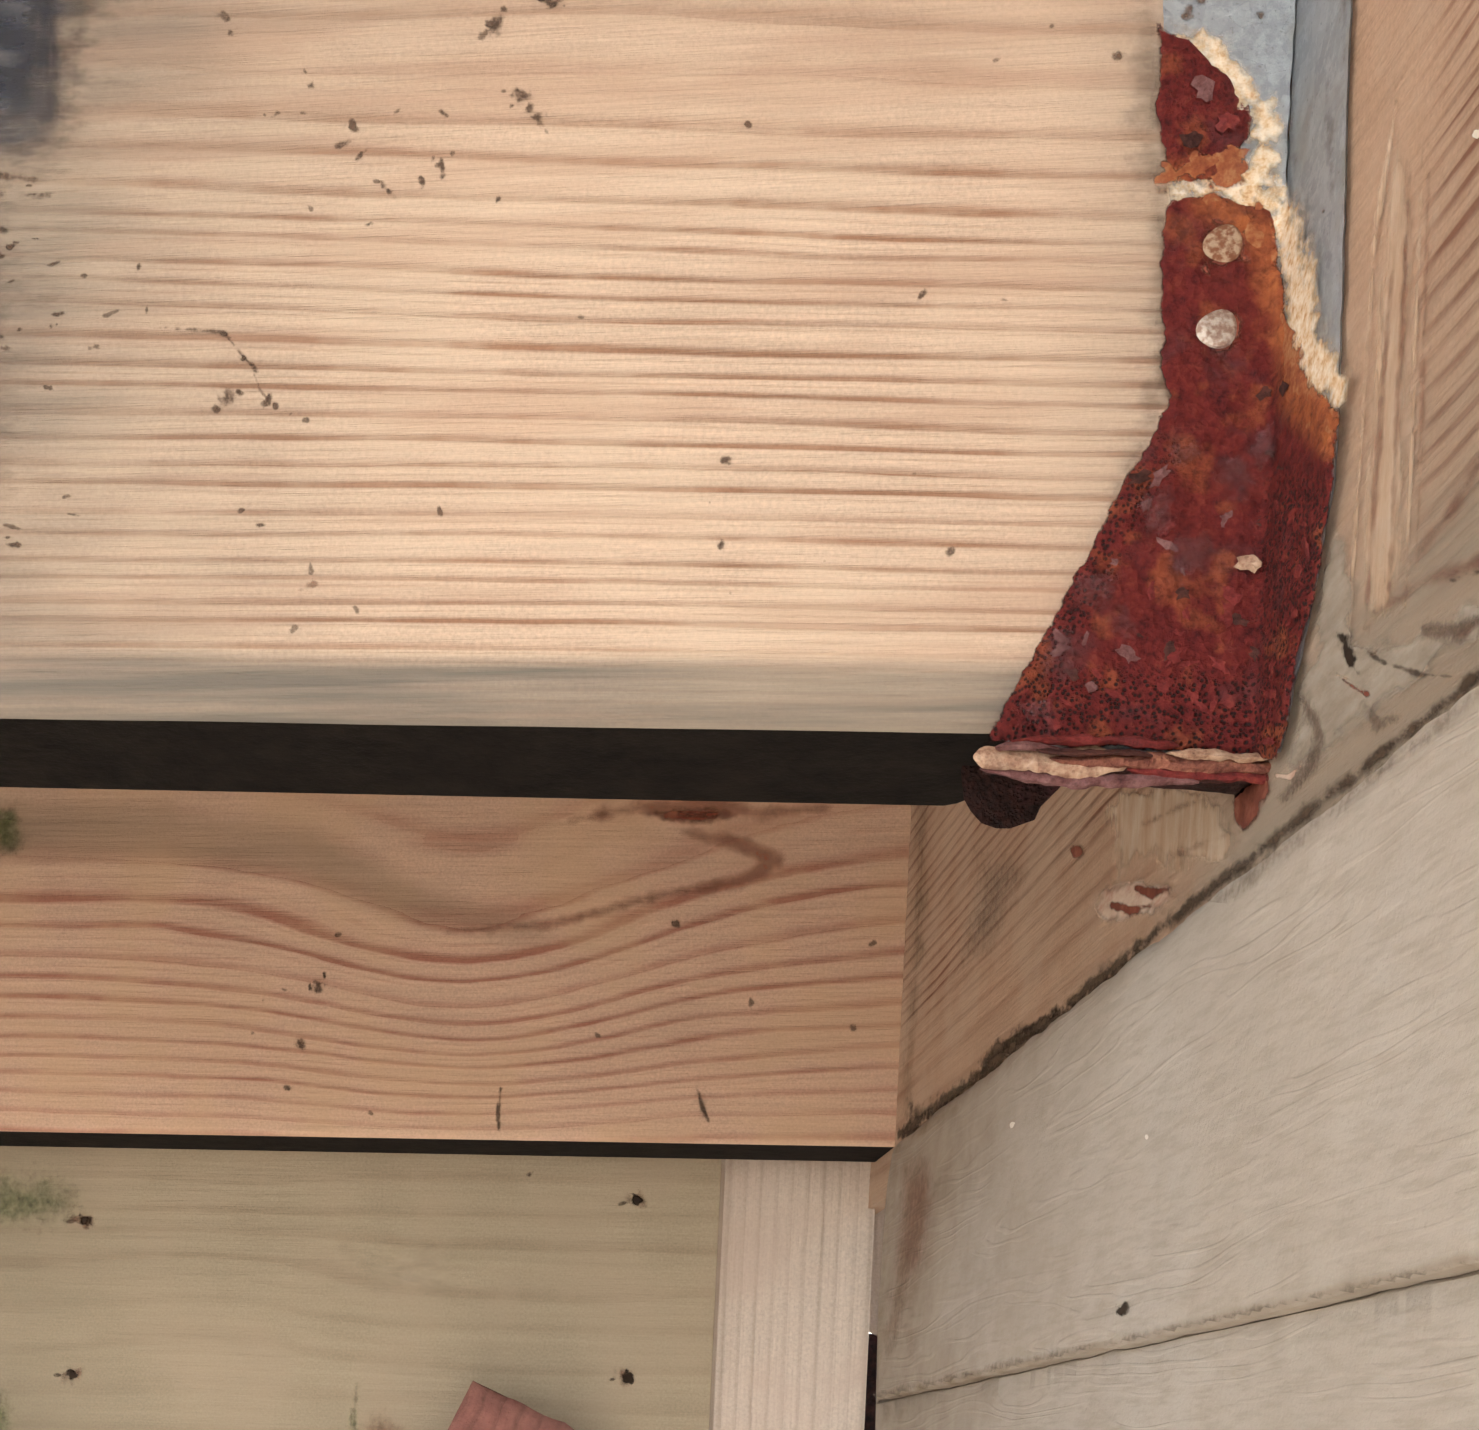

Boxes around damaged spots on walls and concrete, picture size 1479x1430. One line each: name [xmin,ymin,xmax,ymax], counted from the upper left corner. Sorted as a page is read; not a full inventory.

water stain [0,0,64,142]
corrosion [973,24,1347,830]